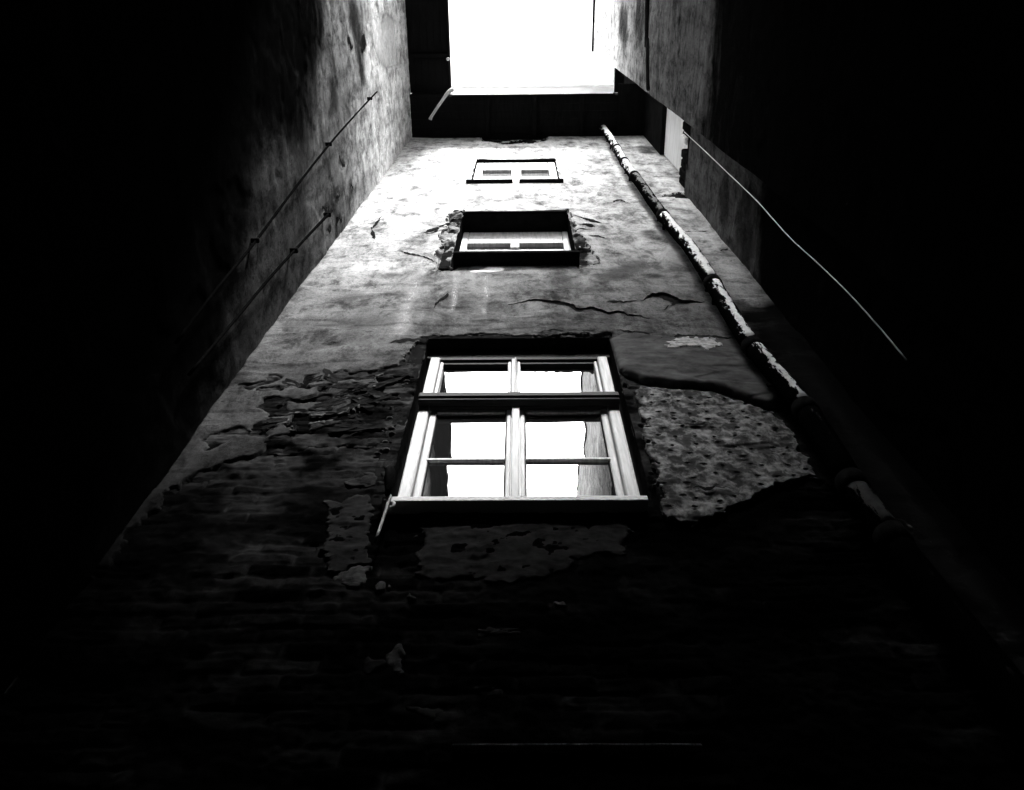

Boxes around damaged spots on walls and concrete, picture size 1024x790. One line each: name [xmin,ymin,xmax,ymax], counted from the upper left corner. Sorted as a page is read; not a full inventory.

spalling [433,210,466,272]
spalling [565,208,601,268]
crack [507,274,733,340]
peeling [202,365,414,455]